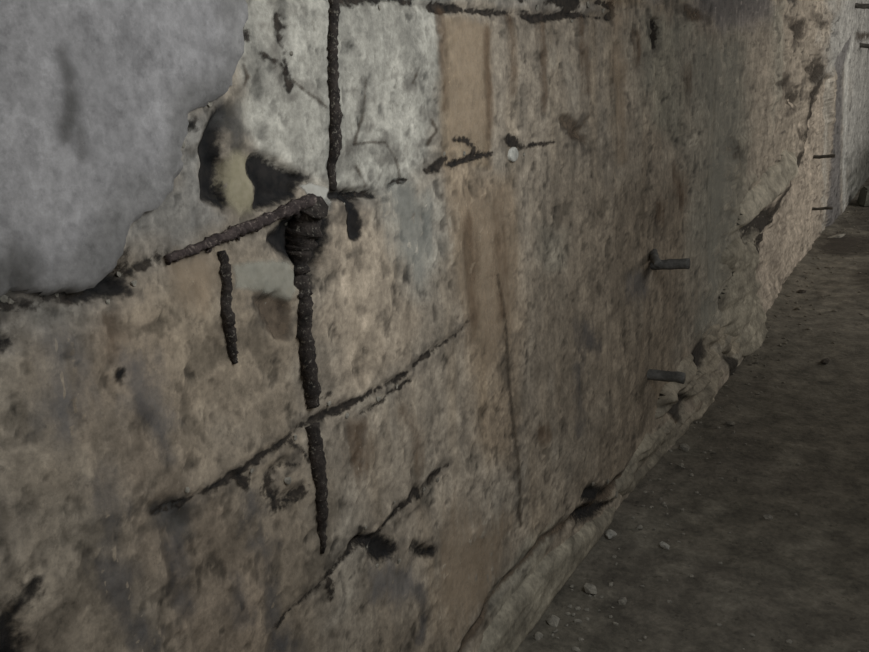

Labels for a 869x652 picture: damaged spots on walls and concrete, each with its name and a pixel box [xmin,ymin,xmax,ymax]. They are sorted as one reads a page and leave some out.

spalling [163,0,374,409]
spalling [739,208,773,246]
spalling [260,422,329,554]
crack [150,320,468,514]
crack [276,463,449,628]